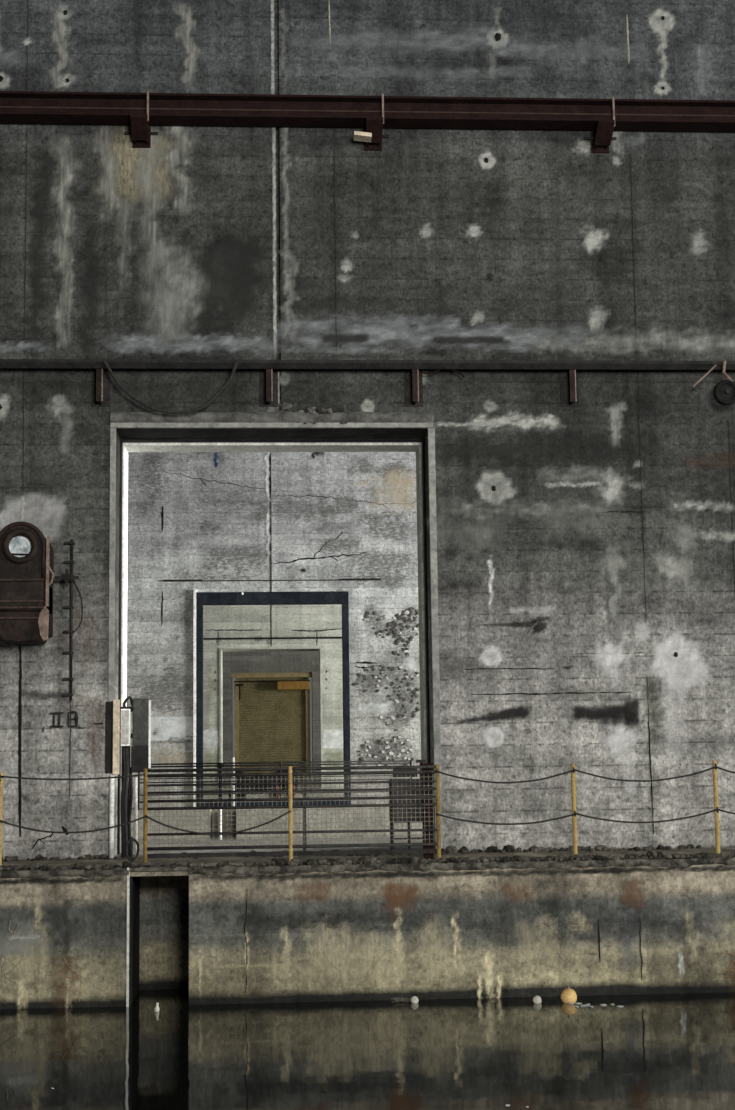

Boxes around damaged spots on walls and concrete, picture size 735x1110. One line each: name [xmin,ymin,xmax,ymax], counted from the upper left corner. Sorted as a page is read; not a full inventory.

leakage [26,140,98,349]
leakage [94,129,126,228]
leakage [120,125,735,352]
peeling [353,607,420,766]
leakage [477,956,501,998]